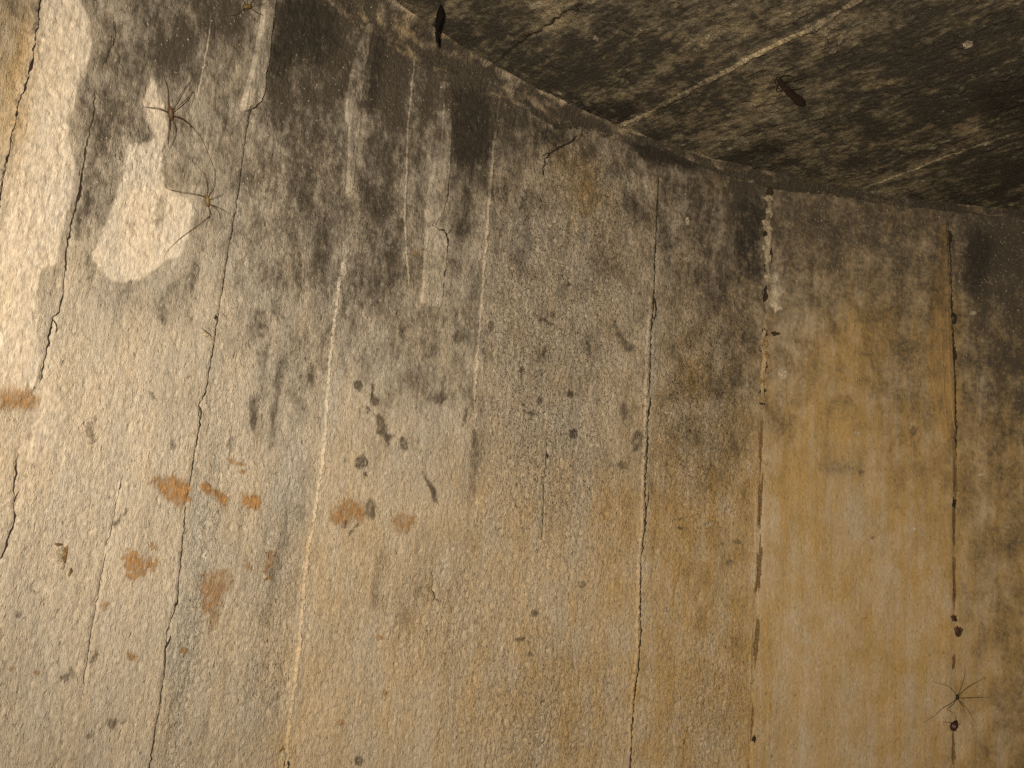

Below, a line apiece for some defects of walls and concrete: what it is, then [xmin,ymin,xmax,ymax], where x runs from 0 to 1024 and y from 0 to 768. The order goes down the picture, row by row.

crack [0,0,42,207]
crack [39,92,96,383]
crack [0,452,19,559]
rust [153,475,227,508]
crack [149,103,260,768]
rust [242,495,261,510]
leakage [354,381,407,450]
crack [629,176,659,768]